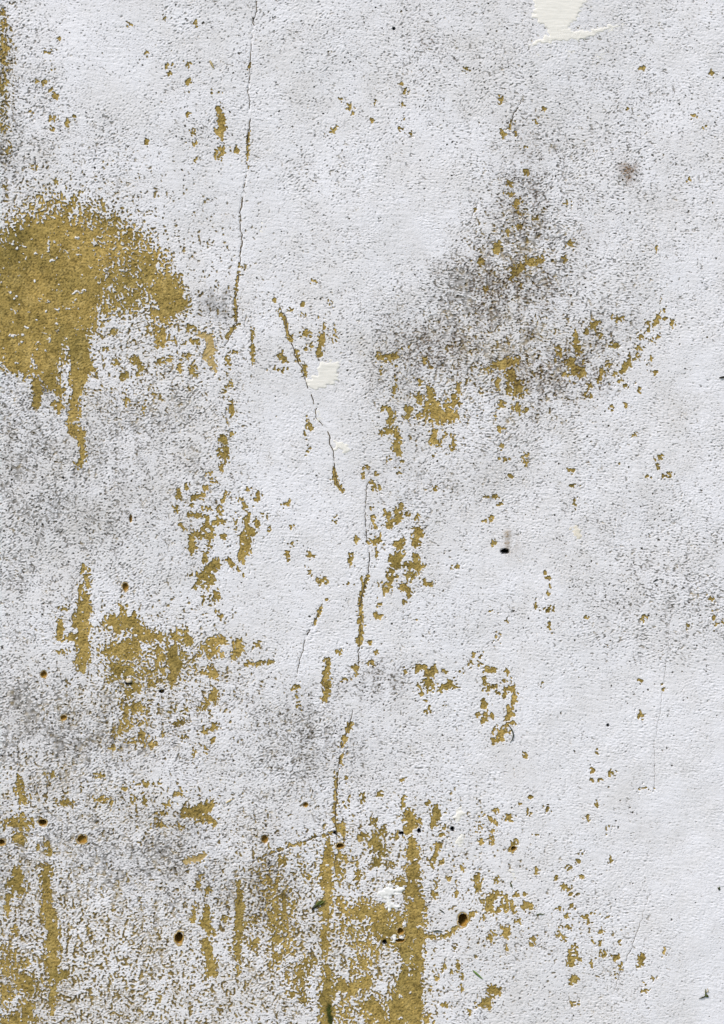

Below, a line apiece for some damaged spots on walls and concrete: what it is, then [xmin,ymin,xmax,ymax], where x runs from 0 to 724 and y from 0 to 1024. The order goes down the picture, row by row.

crack [220,1,257,345]
peeling [0,178,289,621]
crack [272,295,372,674]
peeling [343,345,466,620]
leakage [393,249,555,379]
leakage [492,344,605,402]
peeling [553,296,676,400]
peeling [0,773,71,1024]
peeling [53,563,275,758]
crack [209,710,354,869]
peeling [174,776,552,1024]
peeling [401,609,519,746]